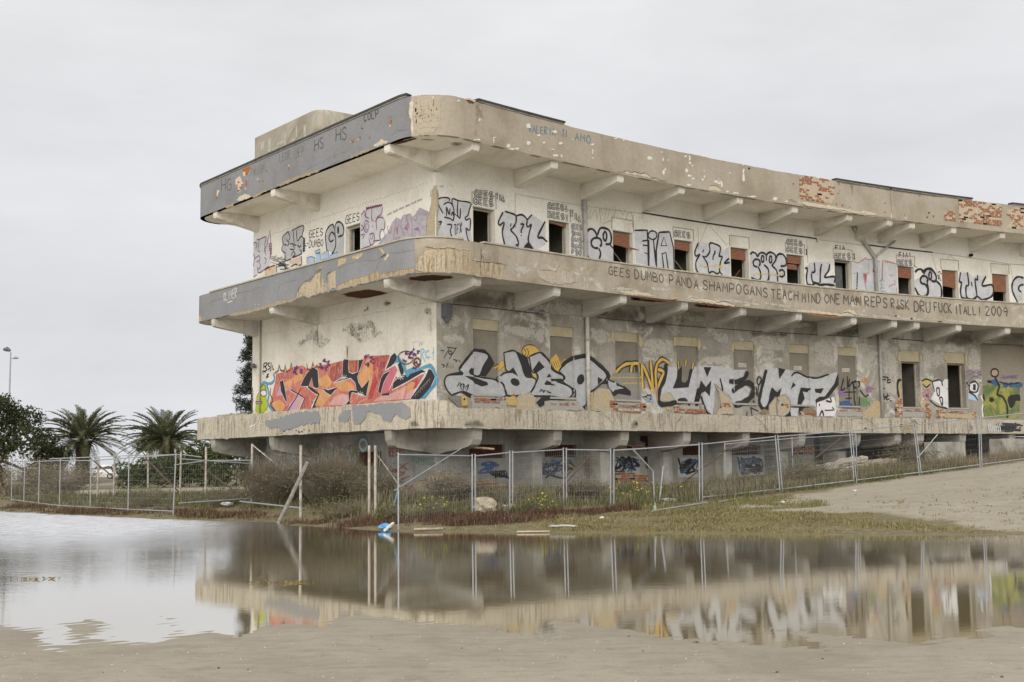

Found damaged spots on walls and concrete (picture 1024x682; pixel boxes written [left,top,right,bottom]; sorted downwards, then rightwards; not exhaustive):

spalling [349,128,388,159]
spalling [216,169,319,208]
spalling [773,175,889,218]
spalling [926,199,1024,229]
spalling [230,185,790,365]
peeling [841,310,1013,326]
peeling [755,322,810,363]